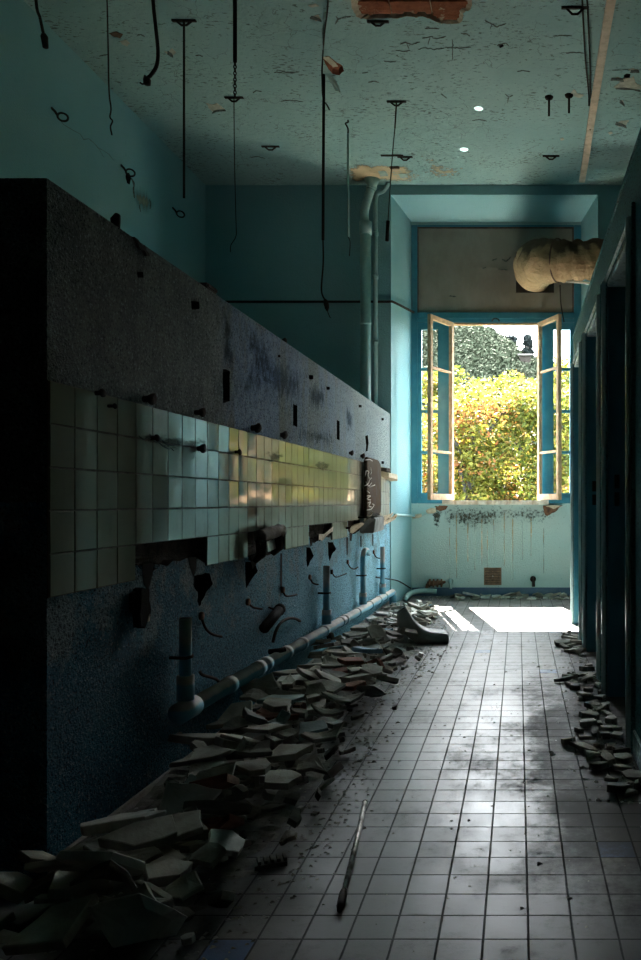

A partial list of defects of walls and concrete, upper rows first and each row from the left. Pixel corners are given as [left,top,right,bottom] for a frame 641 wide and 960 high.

spalling [351,0,472,24]
peeling [350,159,463,182]
damp [447,505,554,527]
spalling [135,537,213,606]
spalling [245,531,271,588]
spalling [306,523,336,567]